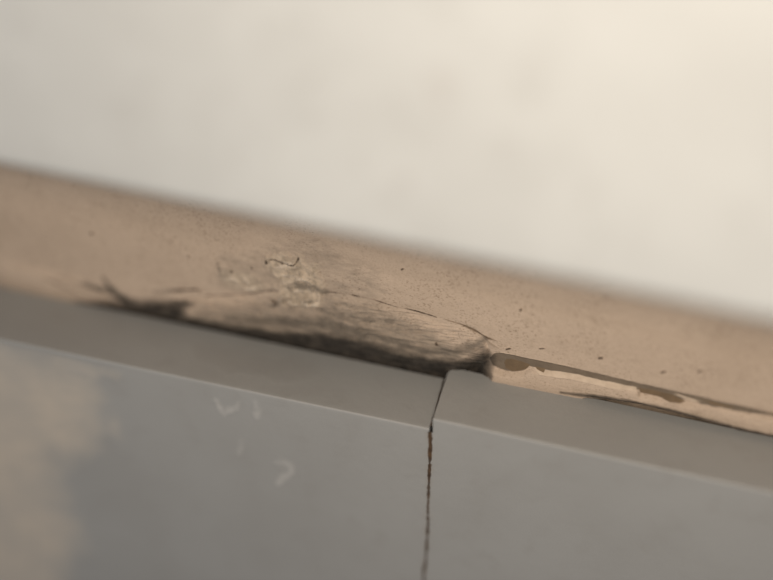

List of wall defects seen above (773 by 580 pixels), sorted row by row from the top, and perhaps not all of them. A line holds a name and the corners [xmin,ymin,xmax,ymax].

crack [427,379,444,433]
peeling [489,352,773,417]